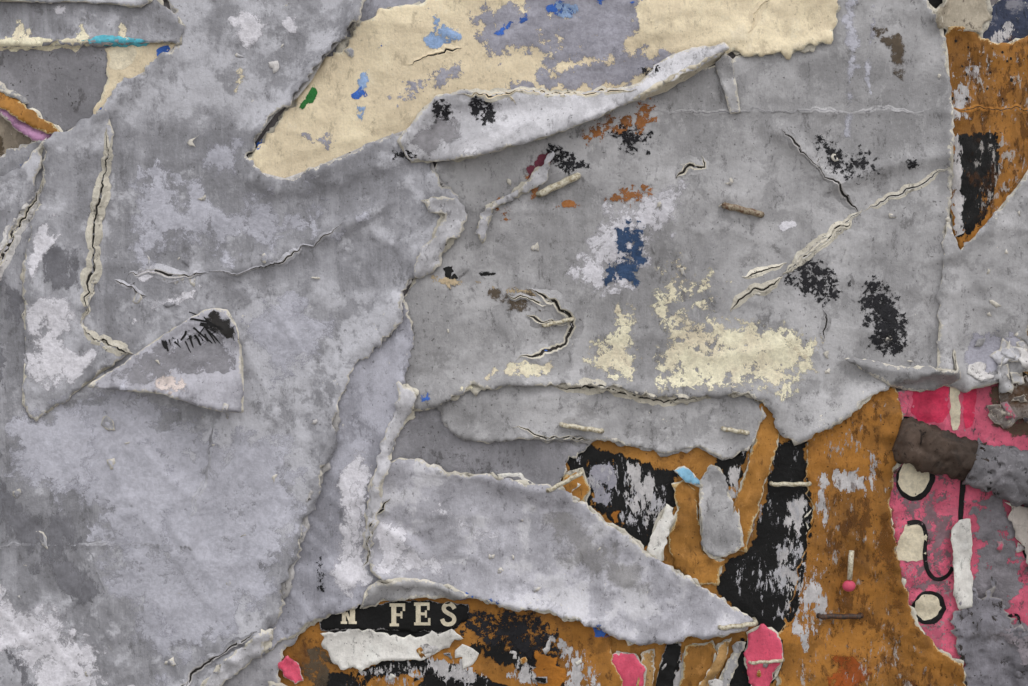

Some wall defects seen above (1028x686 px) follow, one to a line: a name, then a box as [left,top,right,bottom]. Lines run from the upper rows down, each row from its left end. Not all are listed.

crack [462,86,636,104]
crack [80,128,343,357]
crack [649,104,1028,312]
crack [507,288,709,407]
crack [175,631,257,686]